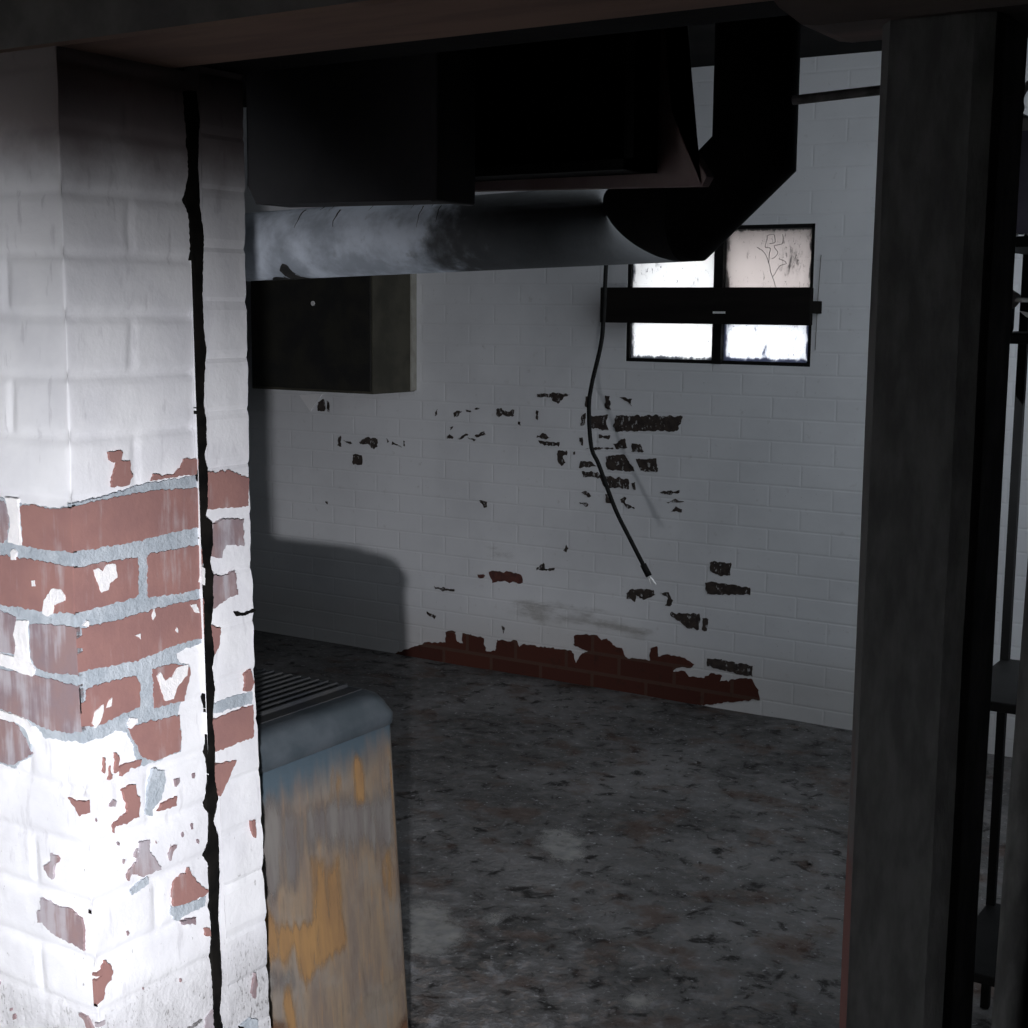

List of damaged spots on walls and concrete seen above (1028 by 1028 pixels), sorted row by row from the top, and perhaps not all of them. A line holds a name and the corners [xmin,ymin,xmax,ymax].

peeling [338,436,405,465]
peeling [537,396,683,509]
crack [182,91,256,1028]
peeling [477,571,523,584]
peeling [626,589,709,631]
peeling [705,561,751,595]
peeling [0,450,255,846]
peeling [395,626,760,706]
peeling [122,823,200,895]
peeling [36,897,92,951]
peeling [169,867,211,937]
peeling [78,960,113,1028]